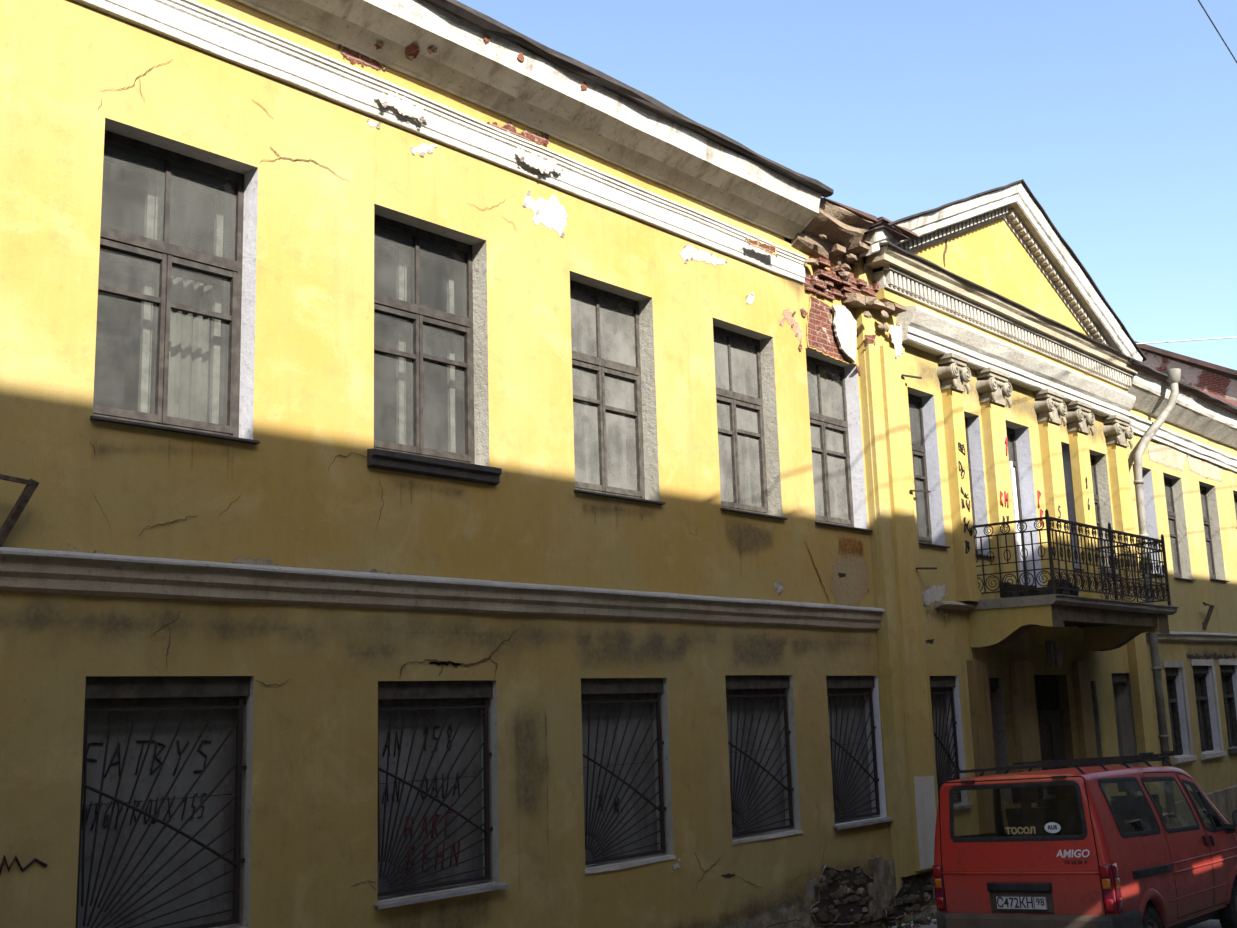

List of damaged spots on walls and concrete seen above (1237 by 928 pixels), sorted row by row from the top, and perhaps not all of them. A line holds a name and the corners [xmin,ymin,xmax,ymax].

crack [98,59,173,110]
crack [252,99,349,181]
peeling [523,190,569,237]
peeling [678,244,728,267]
spalling [779,279,903,375]
crack [399,629,518,678]
spalling [867,856,939,923]